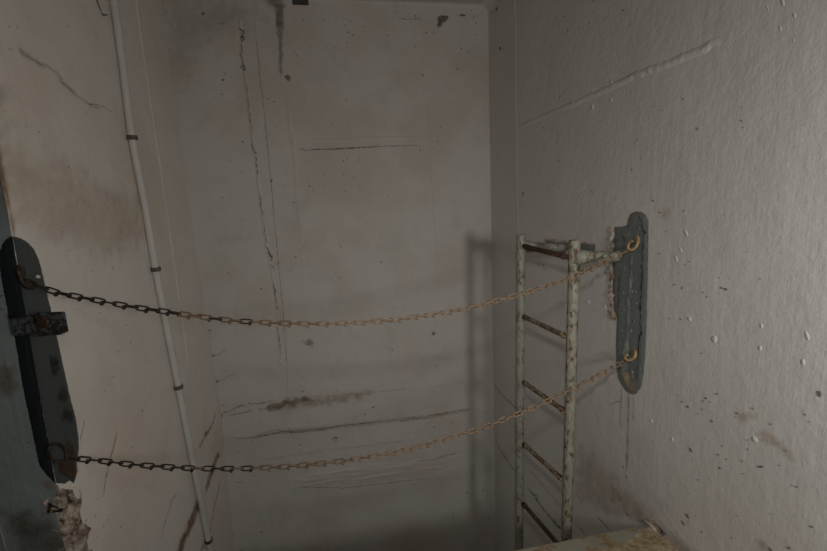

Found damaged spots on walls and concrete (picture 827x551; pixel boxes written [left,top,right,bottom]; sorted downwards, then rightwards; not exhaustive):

crack [254,18,466,400]
crack [232,409,470,460]
spalling [41,485,98,551]